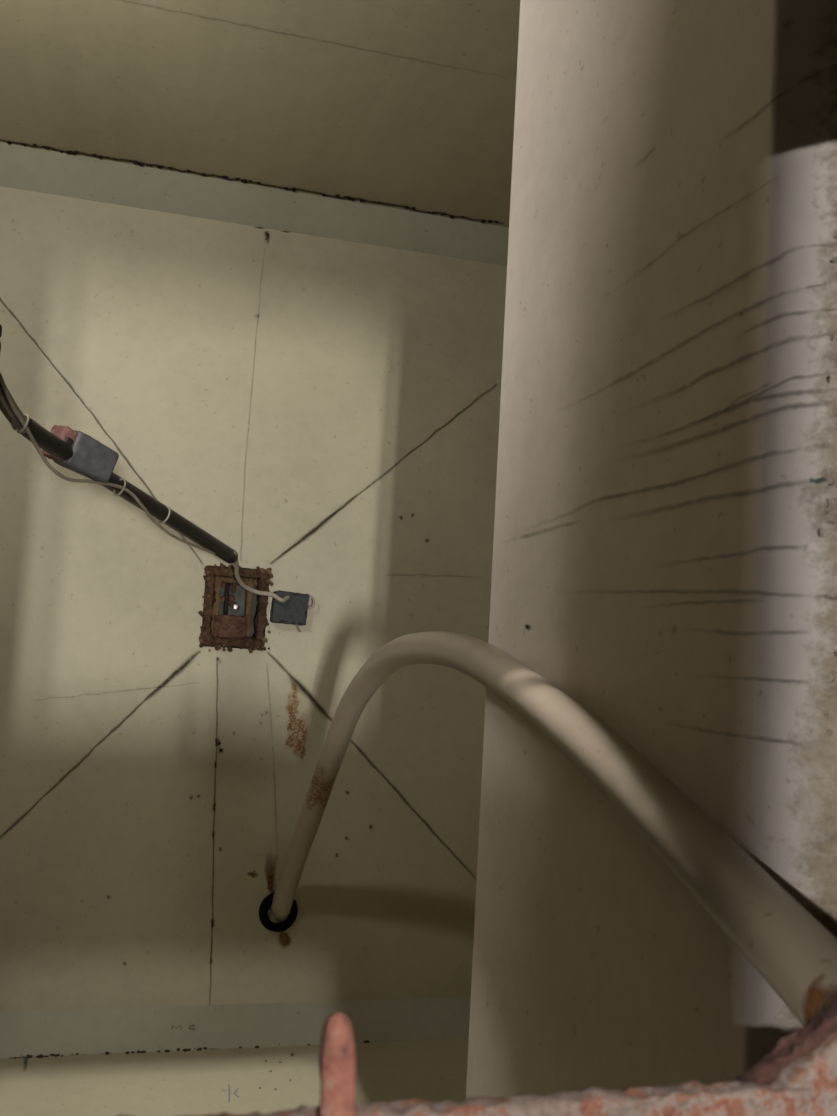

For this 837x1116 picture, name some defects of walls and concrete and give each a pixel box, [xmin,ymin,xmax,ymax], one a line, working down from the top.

rust [286,684,306,757]